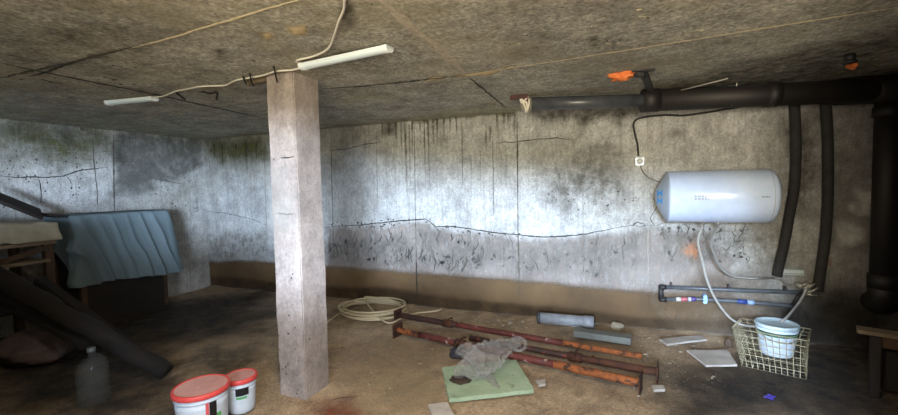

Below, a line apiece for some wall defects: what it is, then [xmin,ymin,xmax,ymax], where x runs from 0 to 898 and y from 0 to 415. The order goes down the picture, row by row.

crack [4,136,183,210]
crack [323,190,663,243]